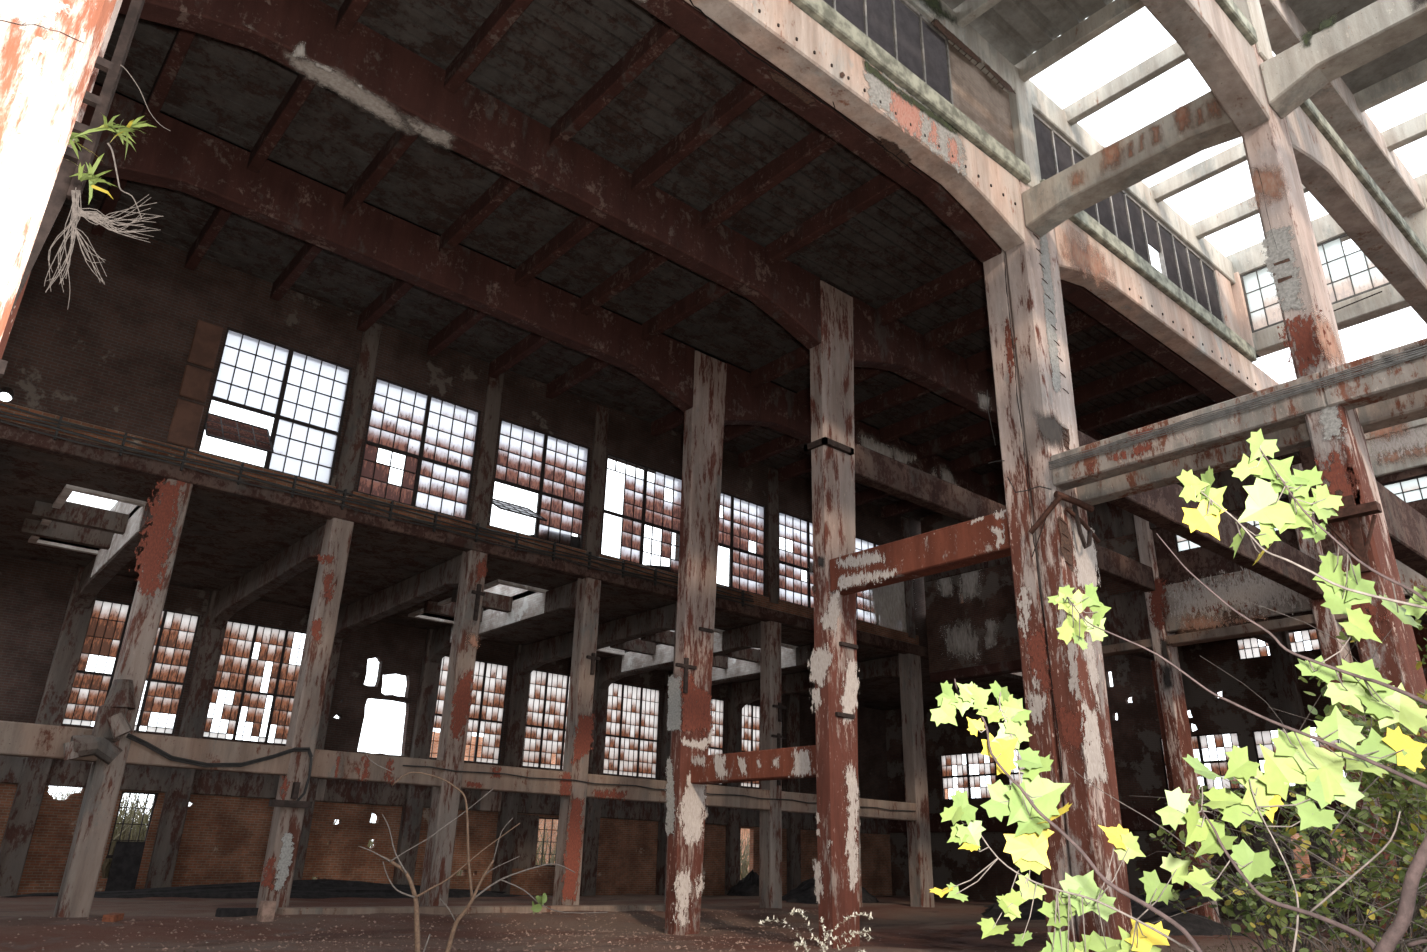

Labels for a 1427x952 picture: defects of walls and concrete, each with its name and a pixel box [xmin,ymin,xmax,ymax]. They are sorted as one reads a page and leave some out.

spalling [0,0,71,83]
peeling [1004,319,1017,384]
spalling [1033,233,1069,394]
rust [1277,305,1341,376]
spalling [1062,427,1070,450]
rust [1112,426,1154,461]
rust [1378,446,1427,463]
peeling [1058,516,1311,631]
peeling [807,549,901,725]
peeling [920,509,1108,788]
peeling [812,763,861,904]